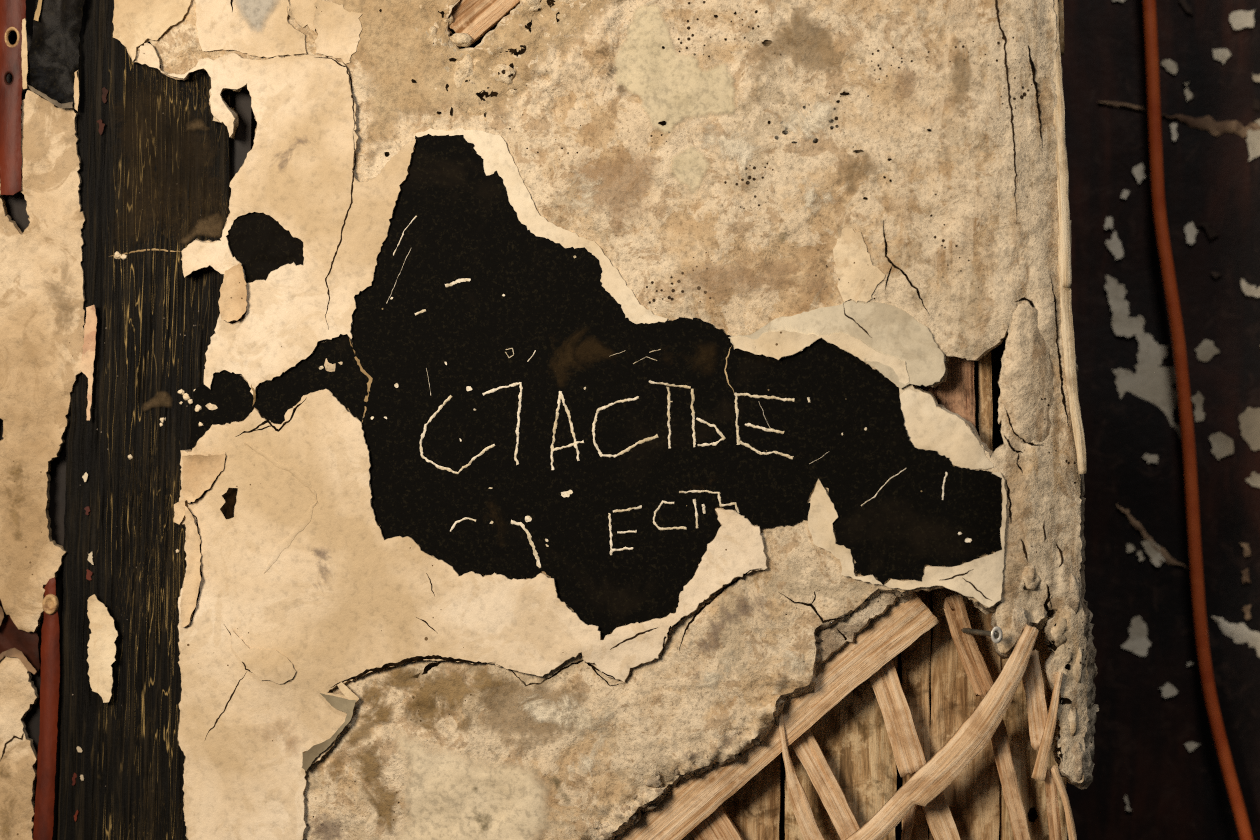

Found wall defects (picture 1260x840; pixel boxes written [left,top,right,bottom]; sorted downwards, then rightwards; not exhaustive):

spalling [1229,10,1255,30]
crack [995,0,1042,224]
crack [1098,101,1260,138]
crack [319,57,373,422]
crack [883,221,928,312]
flaking render [1104,217,1124,260]
flaking render [1104,275,1205,439]
peeling [113,0,1007,840]
flaking render [1209,407,1260,460]
crack [185,384,307,627]
crack [205,626,252,739]
spalling [1120,616,1151,657]